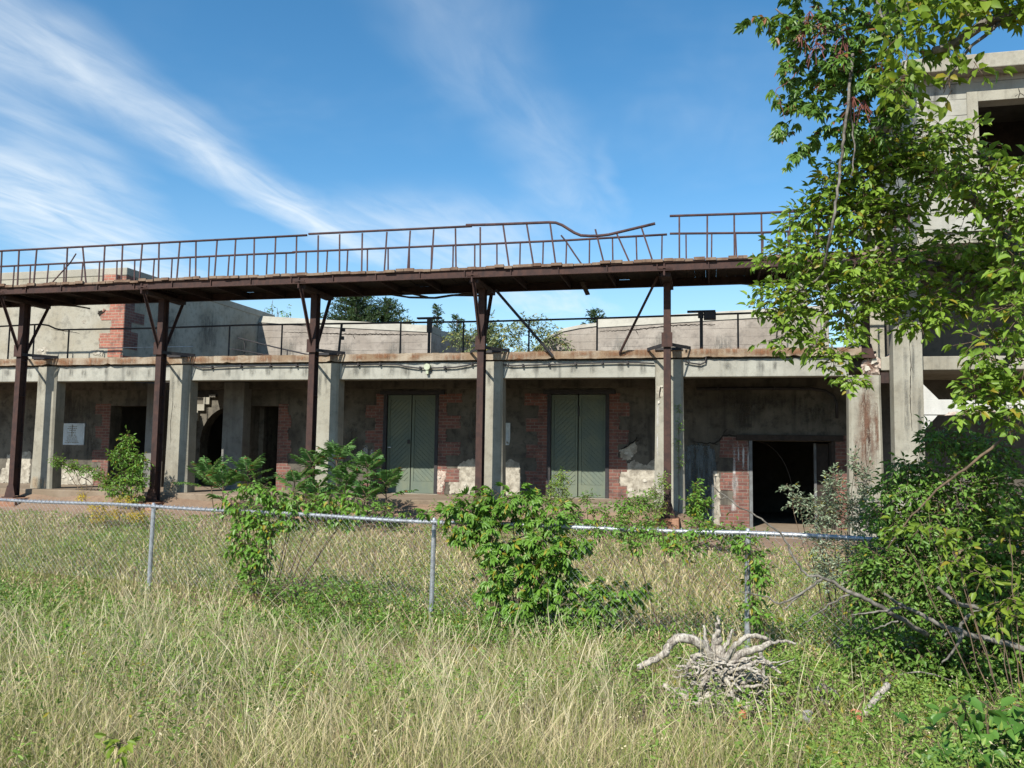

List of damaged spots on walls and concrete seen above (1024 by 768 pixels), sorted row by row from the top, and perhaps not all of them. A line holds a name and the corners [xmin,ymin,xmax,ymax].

rust [854,399,878,479]
spalling [437,458,475,494]
spalling [619,442,655,498]